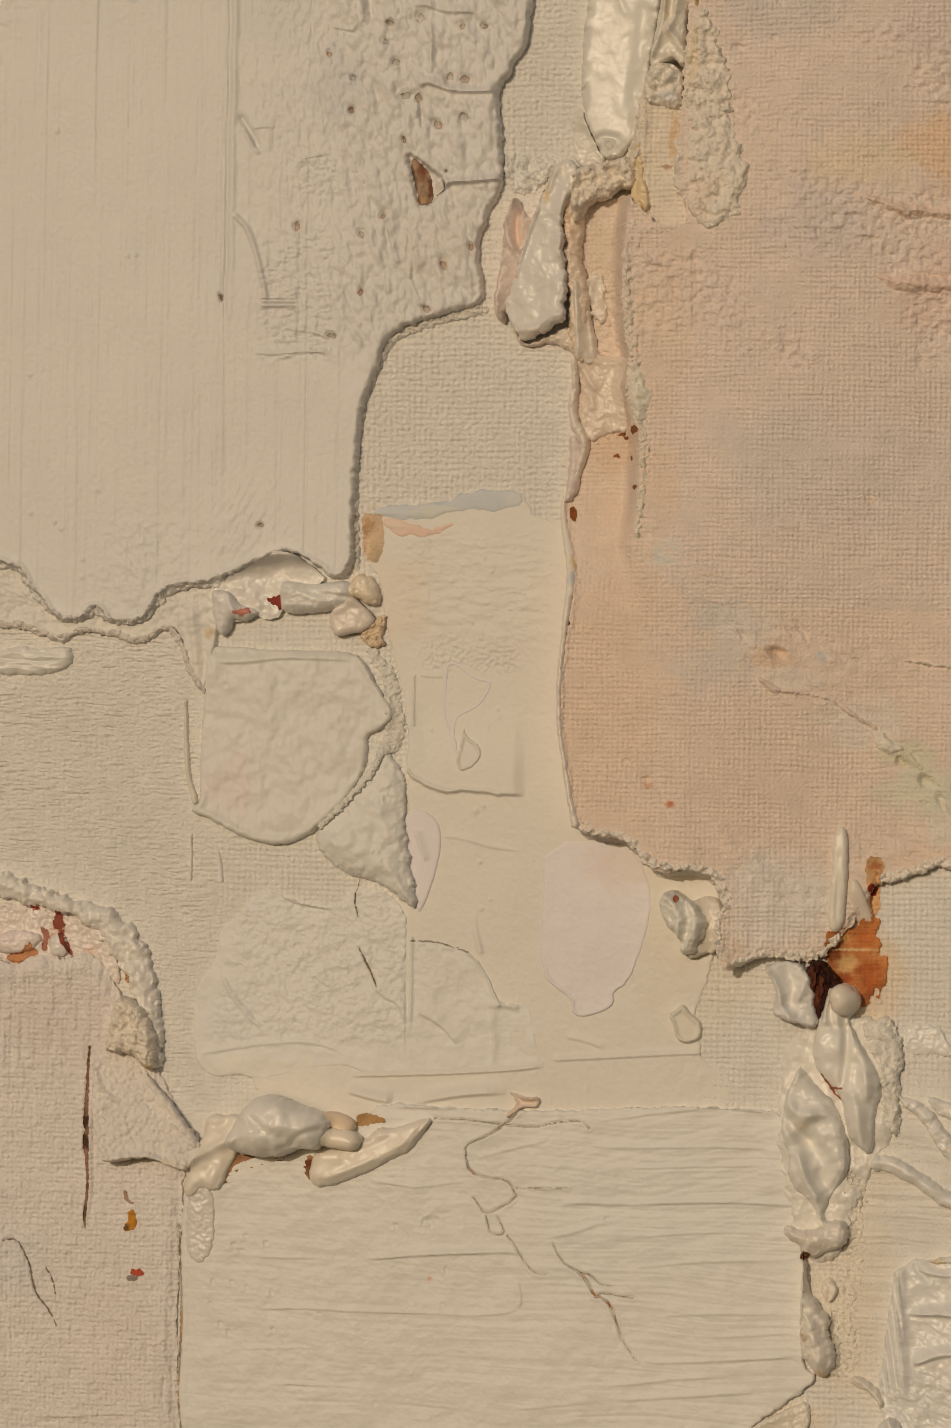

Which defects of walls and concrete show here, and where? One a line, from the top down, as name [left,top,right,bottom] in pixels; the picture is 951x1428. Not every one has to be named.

spalling [586,273,608,325]
corrosion [7,905,73,964]
corrosion [824,856,889,1007]
crack [434,1108,636,1361]